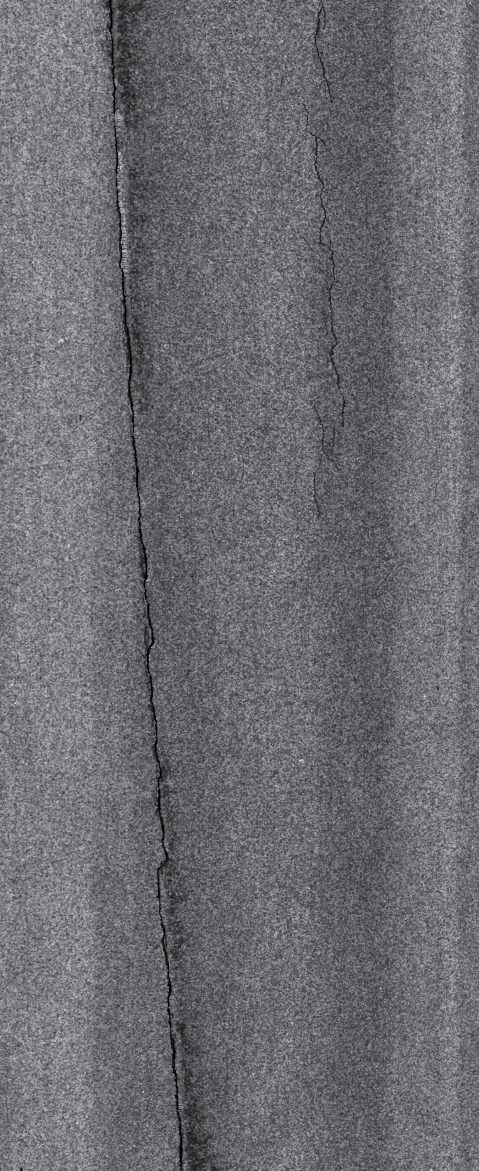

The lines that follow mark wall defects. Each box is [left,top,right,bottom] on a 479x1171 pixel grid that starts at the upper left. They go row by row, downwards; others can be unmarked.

crack [106,0,184,1171]
crack [300,0,345,520]